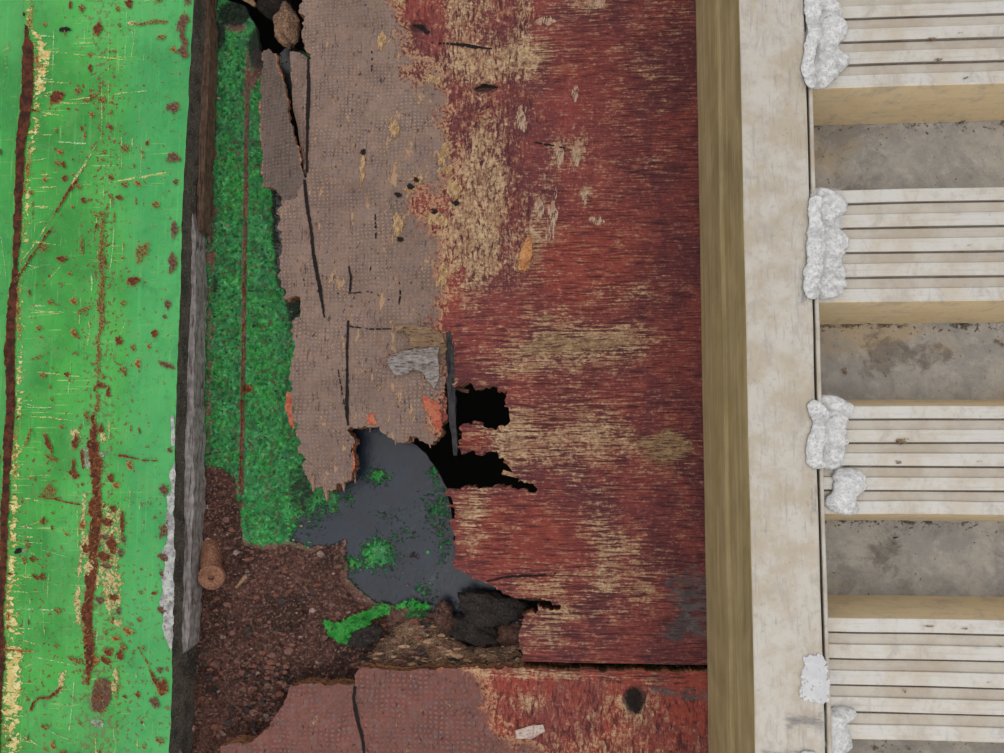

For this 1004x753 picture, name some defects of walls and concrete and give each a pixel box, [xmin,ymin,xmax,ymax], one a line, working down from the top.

rust [115,0,193,58]
rust [165,101,179,116]
peeling [228,0,309,204]
peeling [514,105,528,132]
peeling [534,187,559,245]
rust [168,251,178,274]
rust [0,0,176,753]
peeling [284,391,295,429]
spalling [386,325,537,518]
spalling [513,596,559,607]
peeling [322,598,559,674]
crack [352,686,365,753]